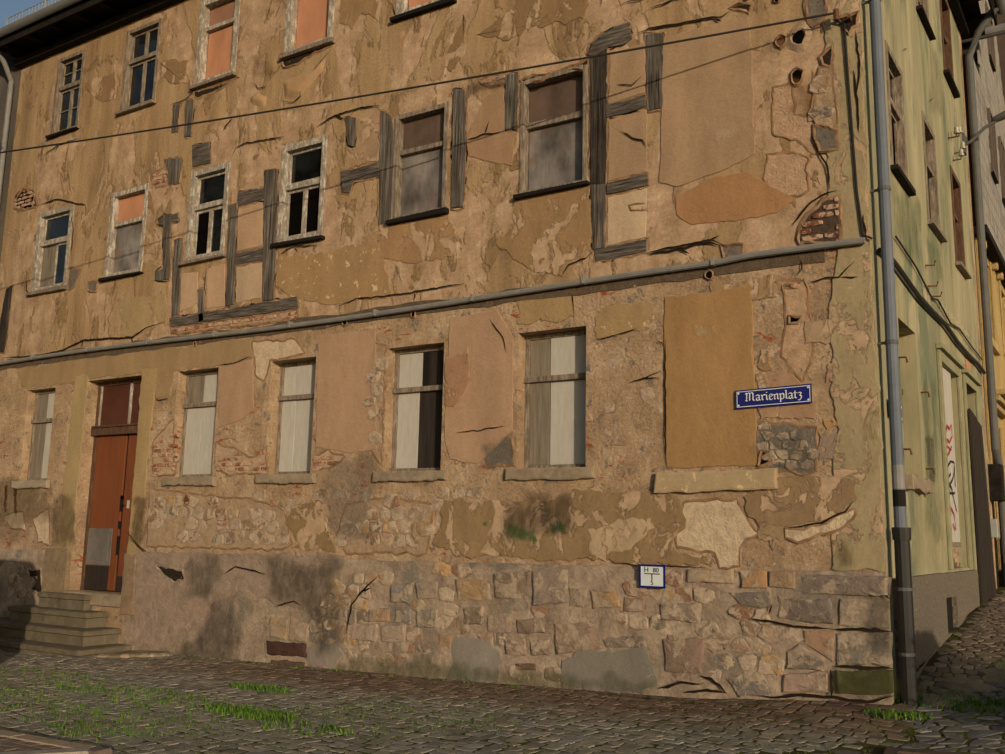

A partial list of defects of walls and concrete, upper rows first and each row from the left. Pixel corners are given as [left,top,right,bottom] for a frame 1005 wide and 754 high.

peeling [444,15,467,72]
peeling [478,0,589,41]
crack [601,0,731,33]
spalling [727,1,754,15]
spalling [803,0,860,35]
spalling [762,45,840,198]
peeling [496,185,593,277]
spalling [795,194,844,246]
peeling [127,274,857,652]
crack [784,502,853,529]
crack [345,576,378,635]